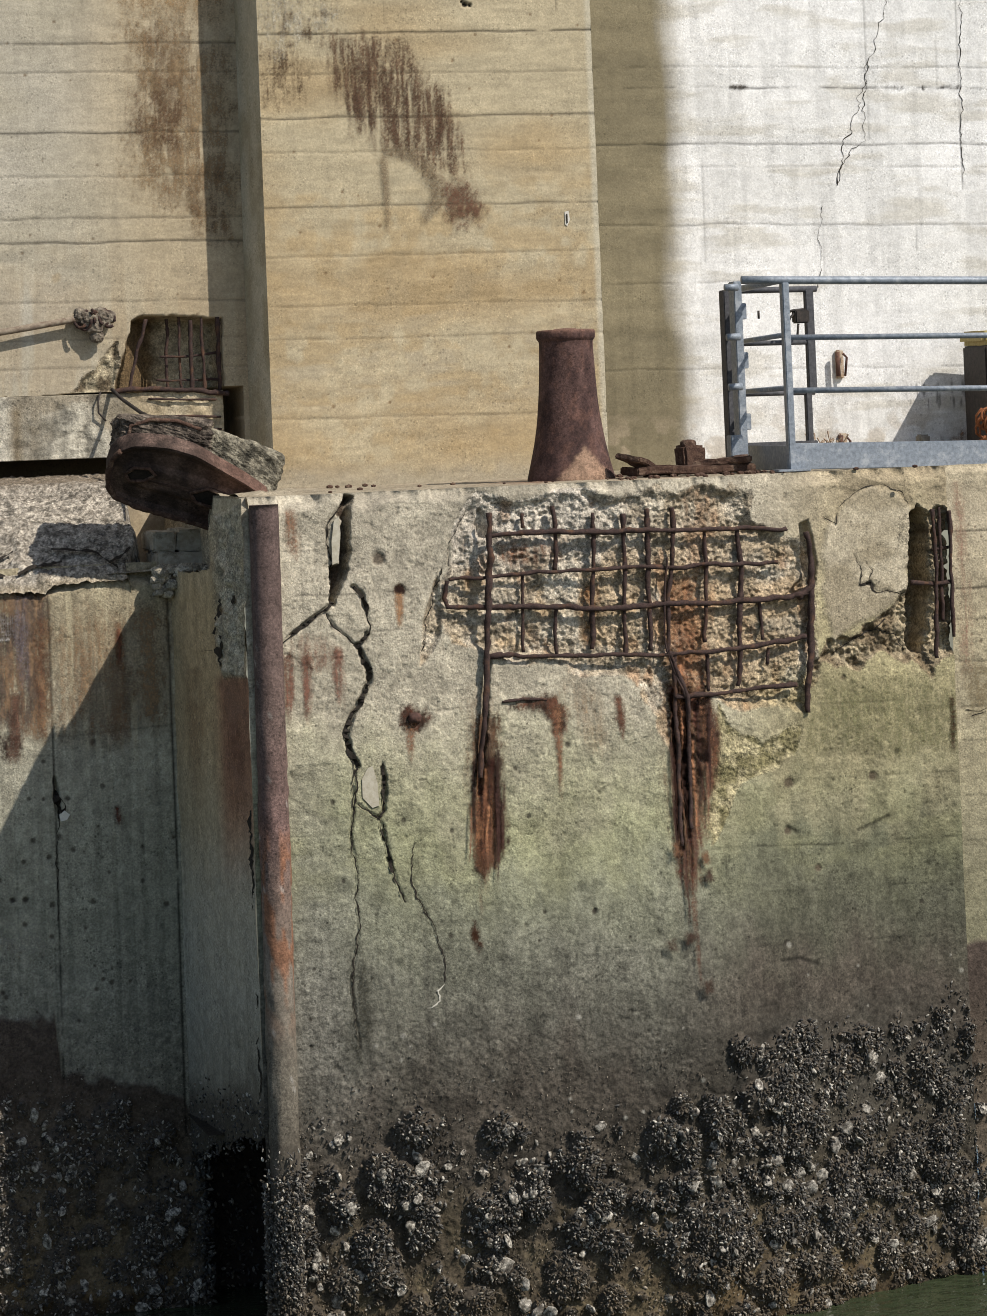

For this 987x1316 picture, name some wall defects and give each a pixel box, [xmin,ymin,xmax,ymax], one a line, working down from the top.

water stain [126,0,241,239]
crack [818,1,887,275]
corrosion [0,591,129,761]
crack [0,546,131,577]
crack [283,494,446,1048]
corrosion [466,693,568,881]
spalling [419,482,956,846]
corrosion [666,576,720,964]